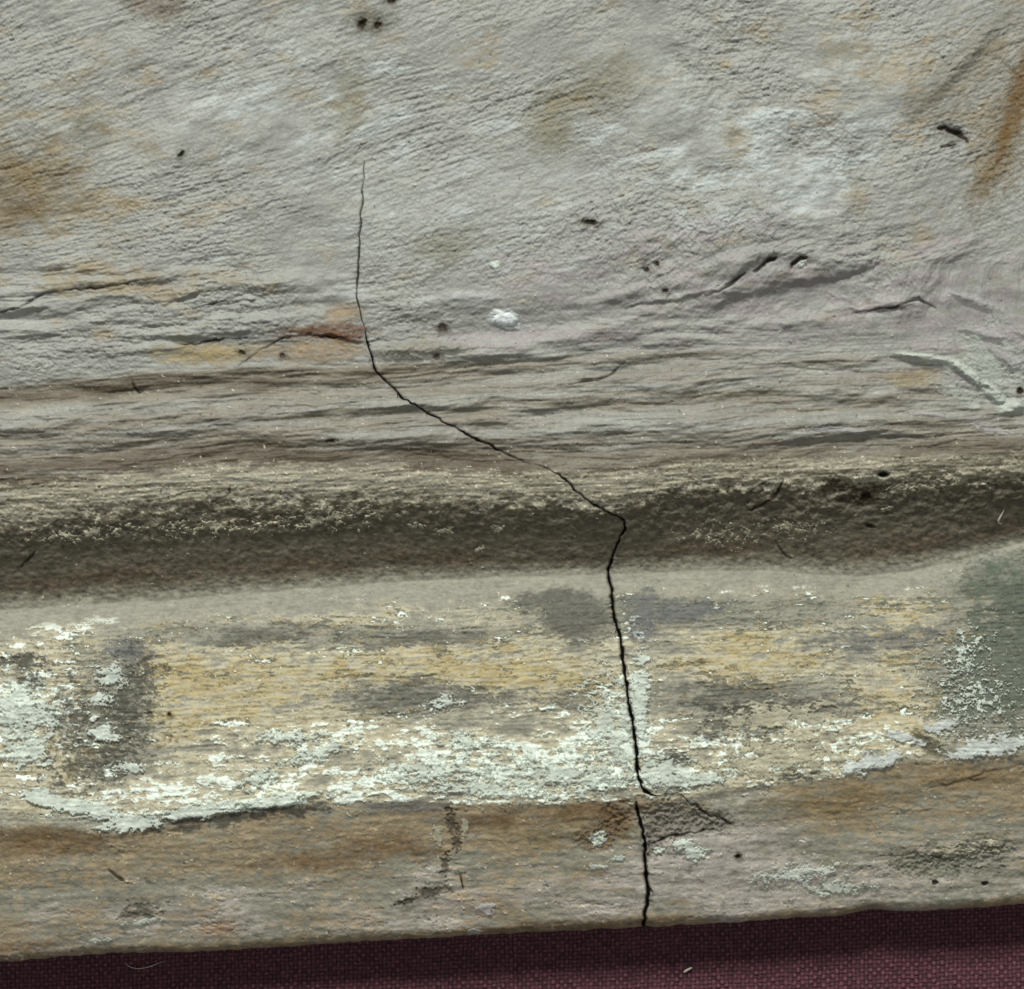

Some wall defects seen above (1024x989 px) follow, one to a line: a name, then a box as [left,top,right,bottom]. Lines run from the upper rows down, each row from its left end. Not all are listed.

corrosion [270,308,365,360]
crack [184,161,678,926]
damp [516,589,613,646]
damp [825,622,945,651]
damp [924,554,1024,738]
damp [0,642,176,797]
damp [692,687,784,746]
damp [152,801,331,834]